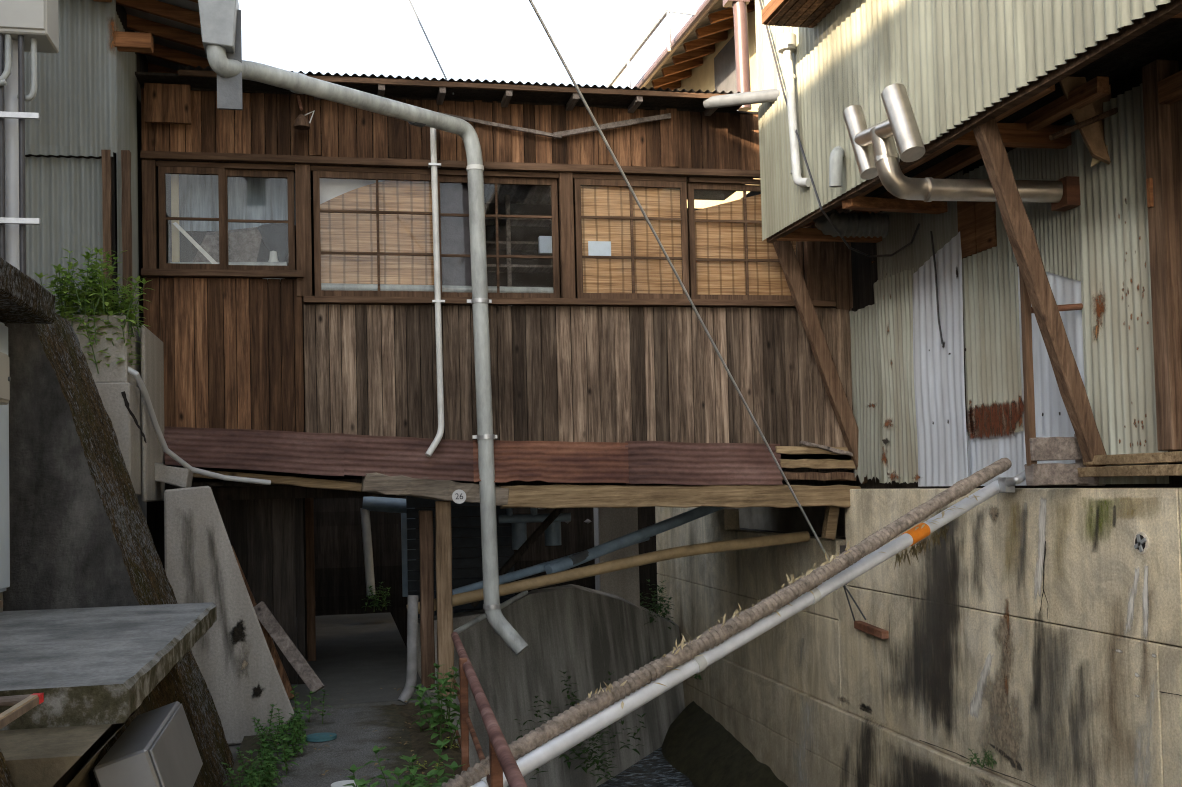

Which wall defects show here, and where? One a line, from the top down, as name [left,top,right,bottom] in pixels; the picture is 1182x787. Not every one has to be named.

rust [1093,292,1105,340]
rust [966,396,1024,439]
leakage [1006,499,1046,594]
leakage [890,507,983,730]
leakage [1033,616,1085,777]
leakage [840,720,874,787]
leakage [895,754,958,787]